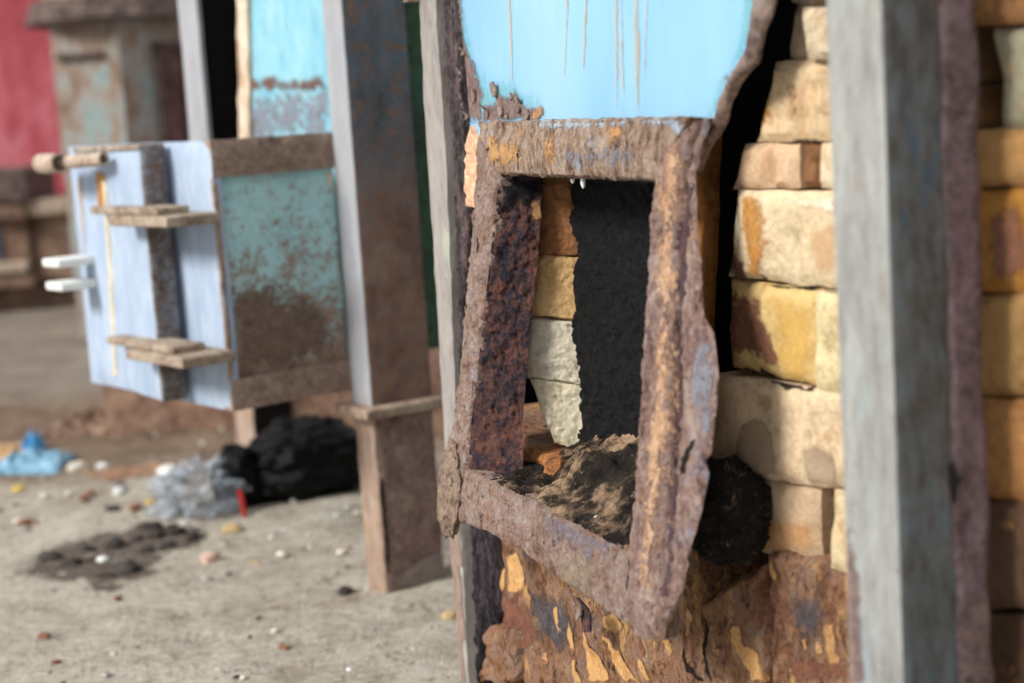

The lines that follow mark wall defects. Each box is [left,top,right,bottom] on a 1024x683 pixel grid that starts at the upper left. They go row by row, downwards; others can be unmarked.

rust [615,0,647,102]
rust [251,75,329,137]
rust [484,133,523,173]
peeling [444,0,626,376]
rust [532,201,542,219]
peeling [641,116,683,135]
rust [232,284,333,377]
rust [639,143,694,596]
rust [449,526,505,683]
spalling [500,553,532,605]
rust [531,517,608,651]
spalling [553,607,652,683]